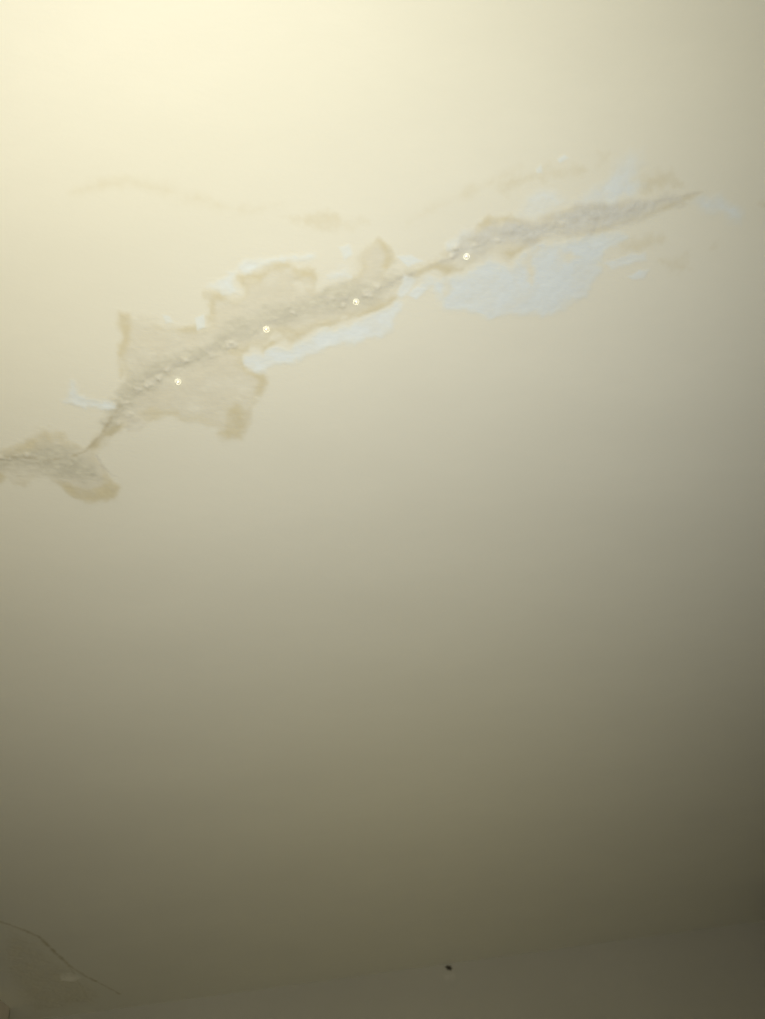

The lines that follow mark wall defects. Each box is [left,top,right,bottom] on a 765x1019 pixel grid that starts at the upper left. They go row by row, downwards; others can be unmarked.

leakage [0,144,704,507]
peeling [238,228,652,377]